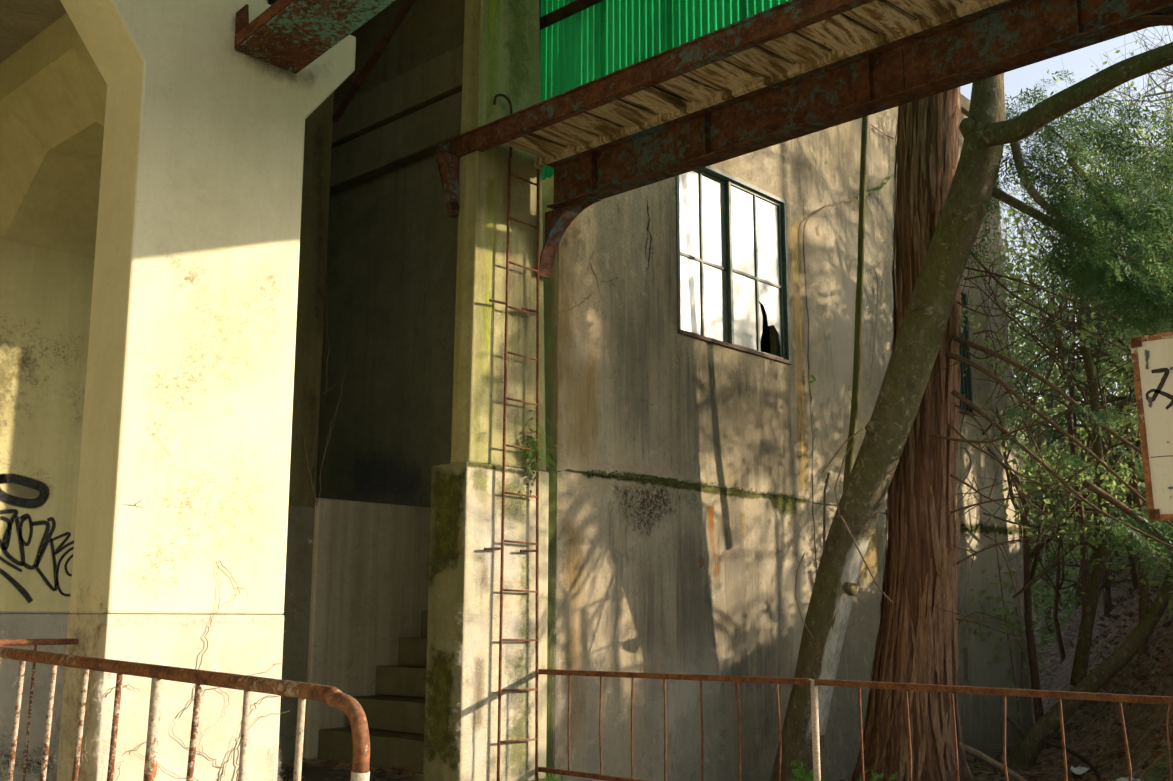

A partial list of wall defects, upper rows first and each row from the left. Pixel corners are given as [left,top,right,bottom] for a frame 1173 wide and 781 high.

water stain [0,347,31,401]
water stain [791,224,806,487]
water stain [617,487,696,533]
water stain [666,605,775,727]
water stain [781,560,808,671]